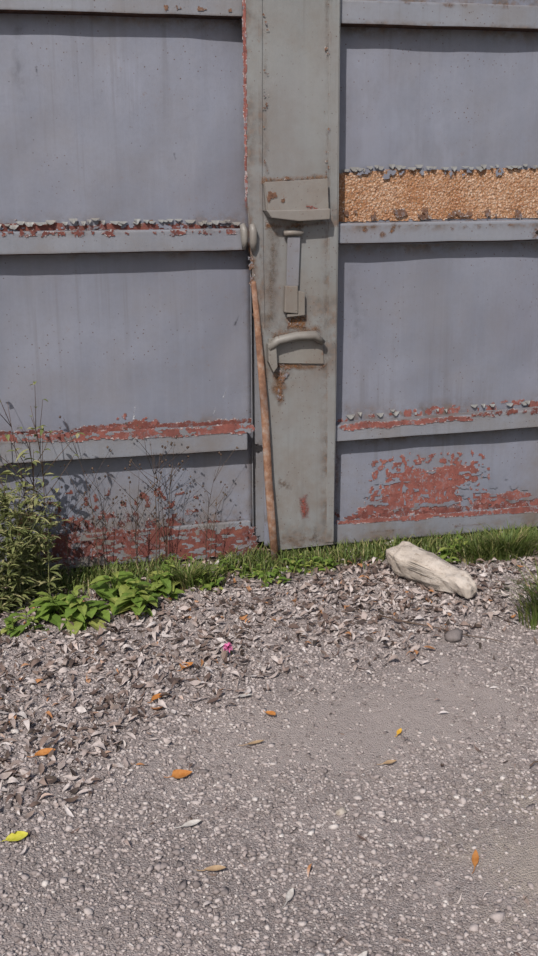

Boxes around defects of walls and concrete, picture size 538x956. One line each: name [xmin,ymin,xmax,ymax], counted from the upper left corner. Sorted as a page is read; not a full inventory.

peeling [228,0,248,206]
peeling [0,218,241,237]